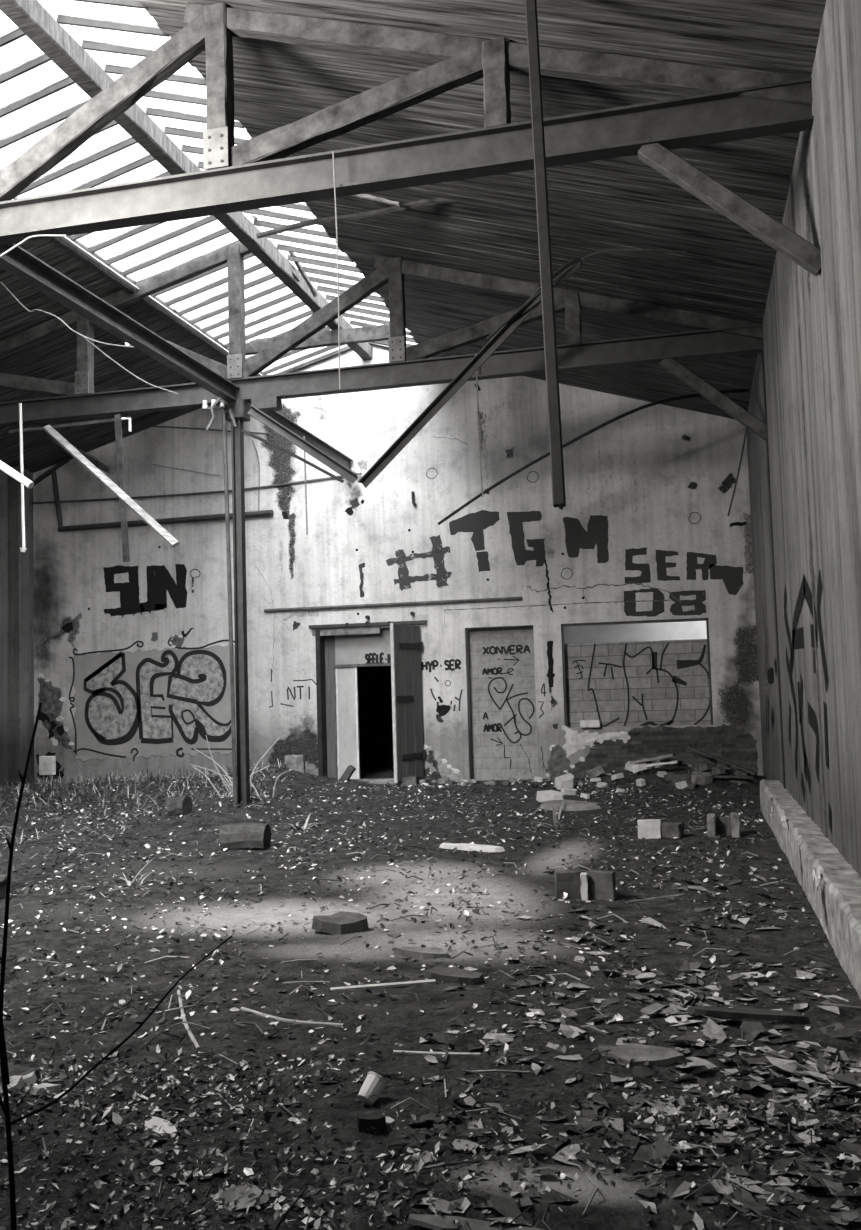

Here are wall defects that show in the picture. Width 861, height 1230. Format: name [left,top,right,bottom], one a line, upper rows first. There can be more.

water stain [277,403,301,423]
water stain [261,425,297,578]
flaking render [37,673,74,750]
flaking render [546,720,758,779]